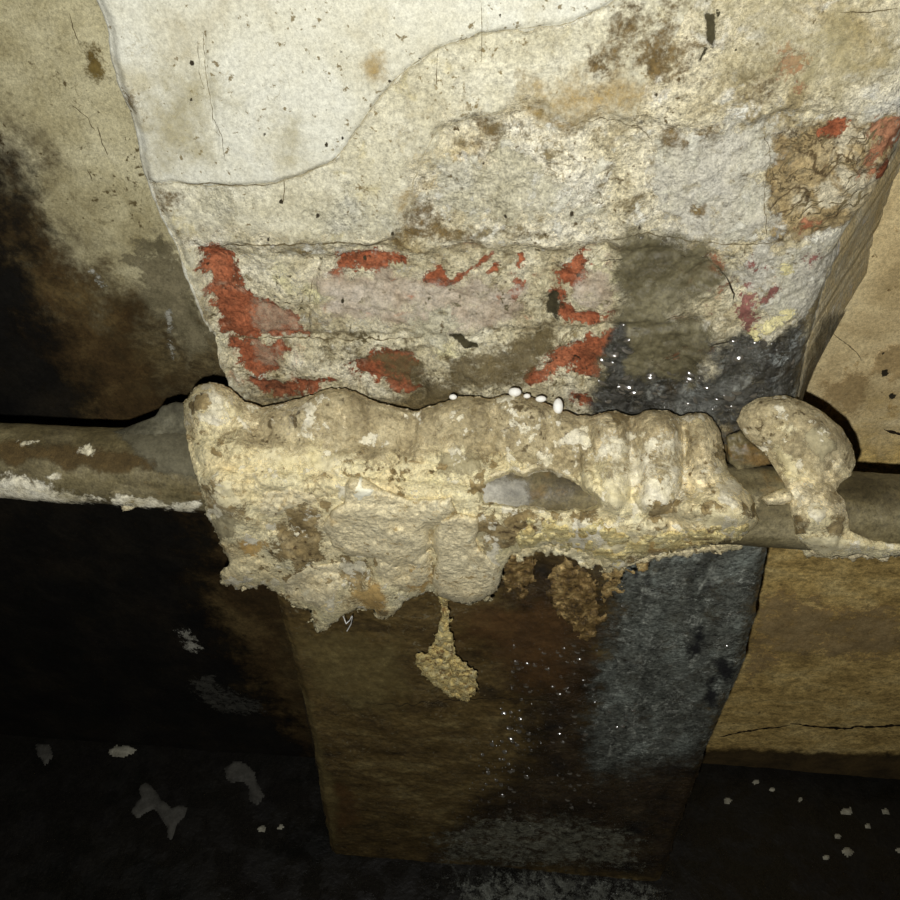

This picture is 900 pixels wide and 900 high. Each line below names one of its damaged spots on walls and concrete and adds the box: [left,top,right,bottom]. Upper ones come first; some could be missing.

damp [0,138,210,428]
flaking render [152,0,900,416]
crack [720,723,900,737]
damp [746,590,900,678]